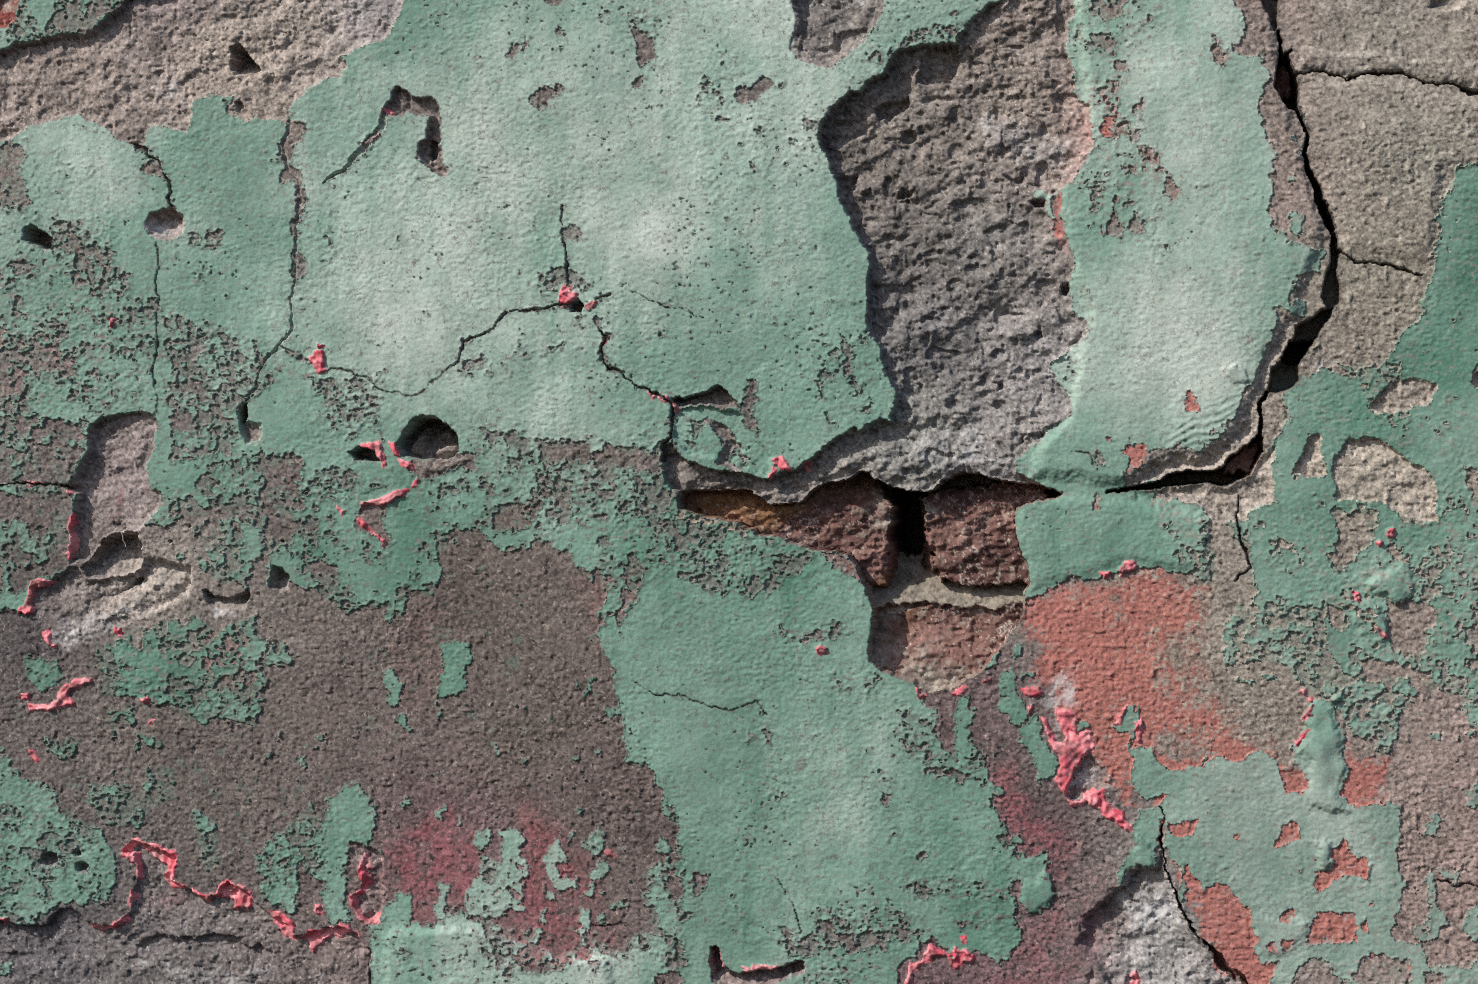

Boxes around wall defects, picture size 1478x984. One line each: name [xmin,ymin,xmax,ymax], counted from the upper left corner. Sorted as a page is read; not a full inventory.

peeling [0,0,689,984]
crack [245,111,740,463]
flaking render [661,0,1478,984]
crack [1072,0,1478,582]
crack [1159,806,1248,984]